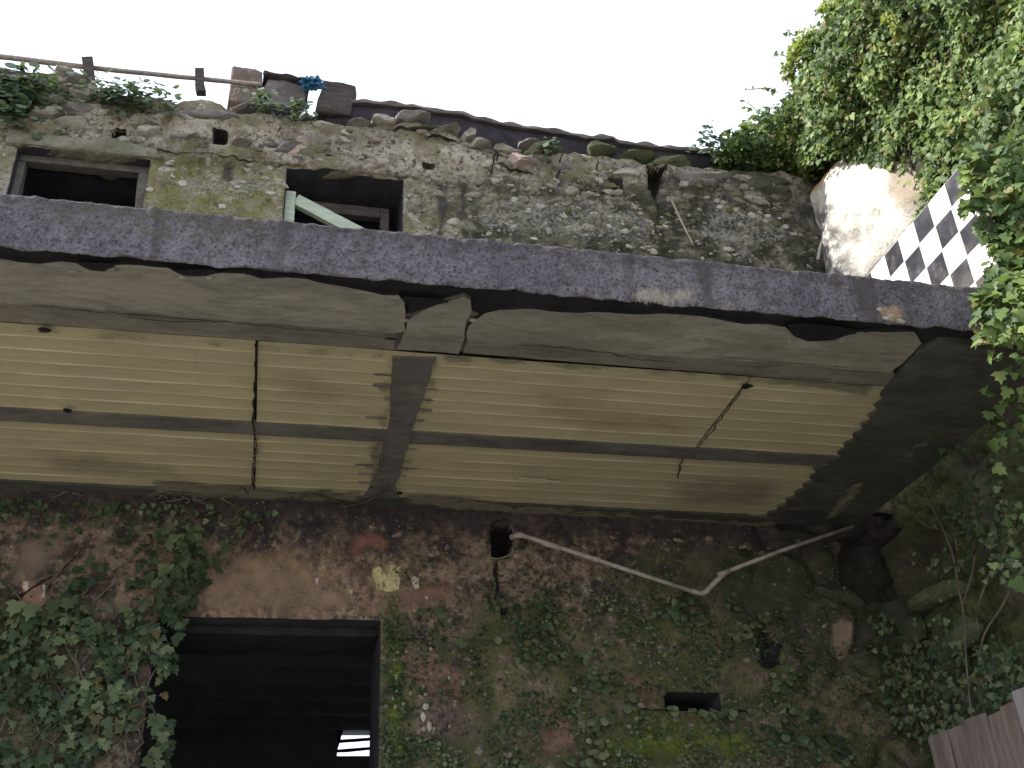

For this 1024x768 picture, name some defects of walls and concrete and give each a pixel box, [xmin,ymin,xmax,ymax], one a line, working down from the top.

crack [4,303,398,495]
crack [677,388,743,478]